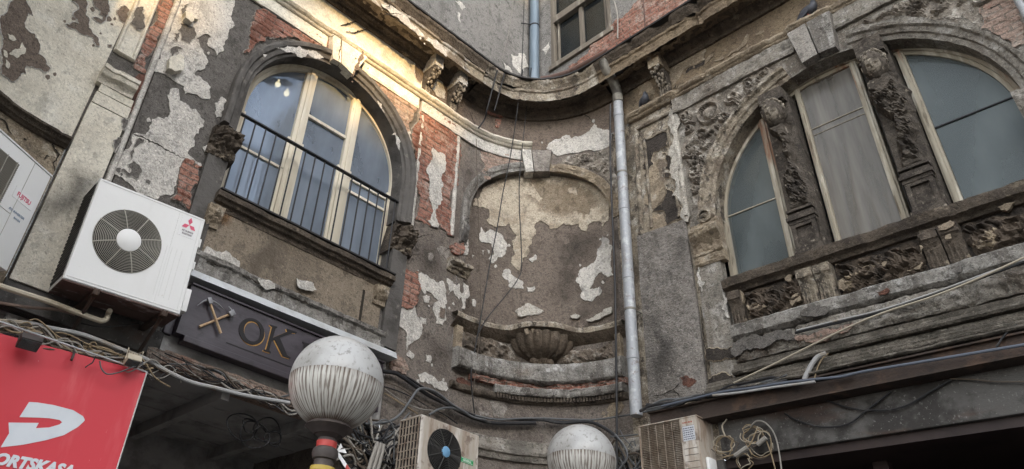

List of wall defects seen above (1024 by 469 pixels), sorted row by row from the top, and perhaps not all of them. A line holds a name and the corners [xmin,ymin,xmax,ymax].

flaking render [0,0,57,83]
flaking render [243,9,329,59]
flaking render [64,0,235,211]
flaking render [351,51,613,302]
flaking render [639,108,690,231]
flaking render [389,268,476,391]